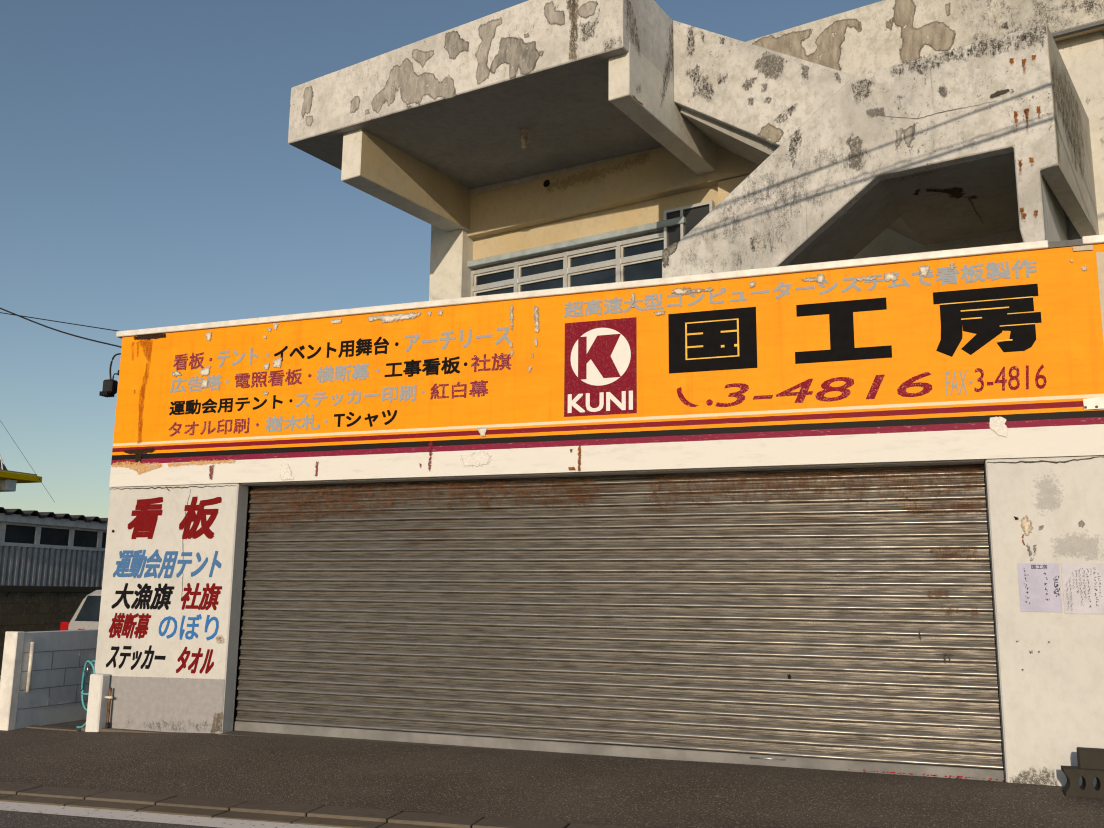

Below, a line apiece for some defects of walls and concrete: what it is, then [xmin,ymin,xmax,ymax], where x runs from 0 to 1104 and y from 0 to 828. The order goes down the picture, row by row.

peeling [350,18,543,114]
peeling [752,18,862,71]
leakage [834,73,885,117]
peeling [886,0,956,63]
leakage [893,0,1100,74]
corrosion [1013,106,1041,126]
leakage [1053,65,1084,175]
spalling [1014,515,1044,536]